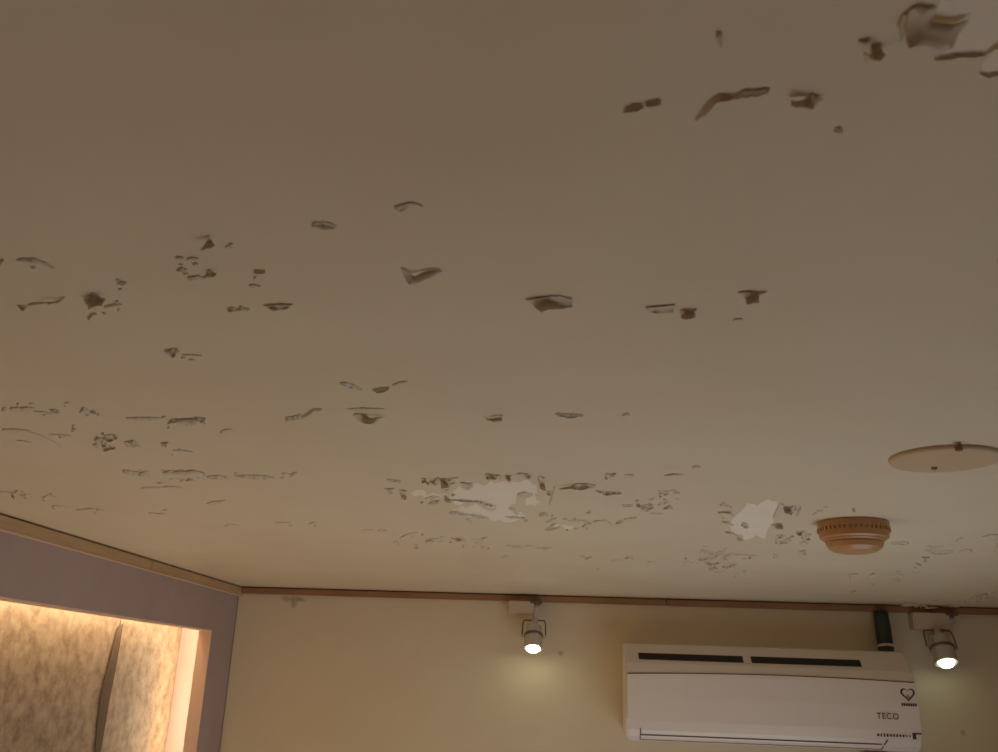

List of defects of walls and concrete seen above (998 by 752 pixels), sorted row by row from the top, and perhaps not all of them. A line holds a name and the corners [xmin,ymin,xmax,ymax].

peeling [859,40,886,65]
peeling [899,0,998,79]
peeling [175,236,234,282]
peeling [83,279,127,320]
peeling [164,348,202,361]
peeling [93,432,141,452]
peeling [126,416,206,429]
peeling [122,469,298,490]
peeling [384,473,680,531]
peeling [718,499,812,558]